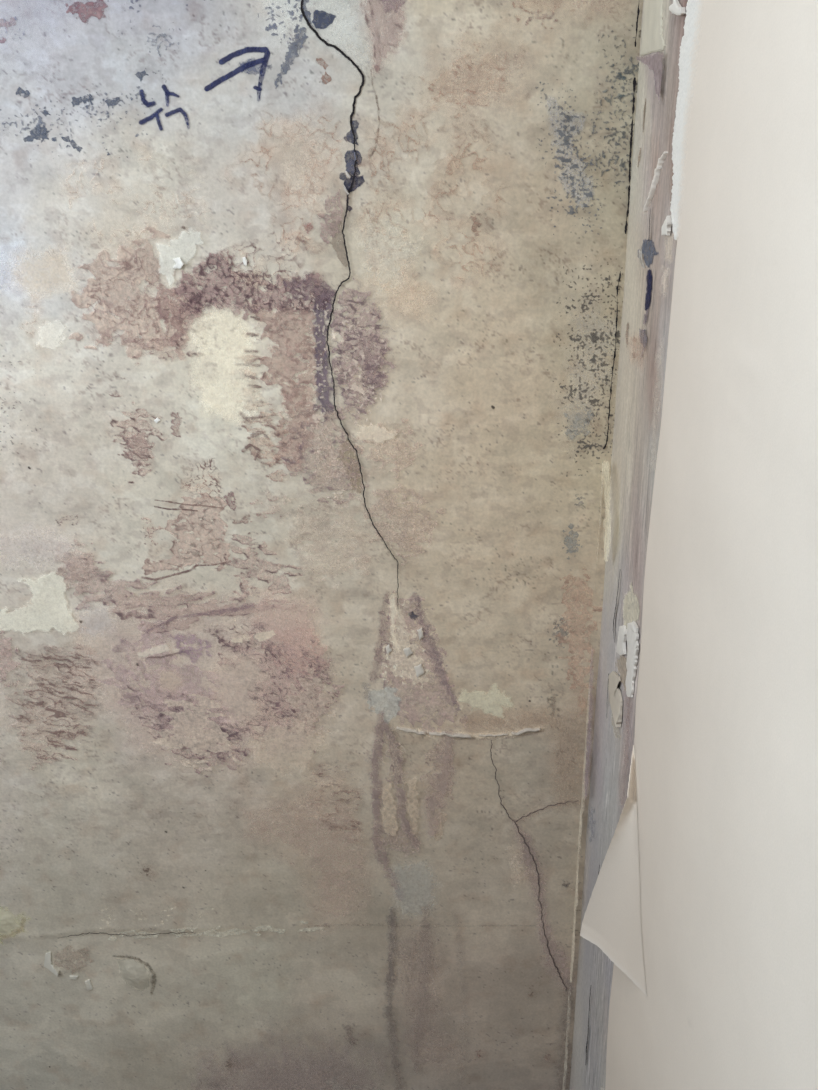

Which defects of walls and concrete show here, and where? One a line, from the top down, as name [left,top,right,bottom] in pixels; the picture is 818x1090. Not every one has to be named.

damp [69,153,394,504]
crack [301,0,399,603]
flaking render [608,621,639,727]
damp [370,713,454,1080]
crack [490,740,591,1065]